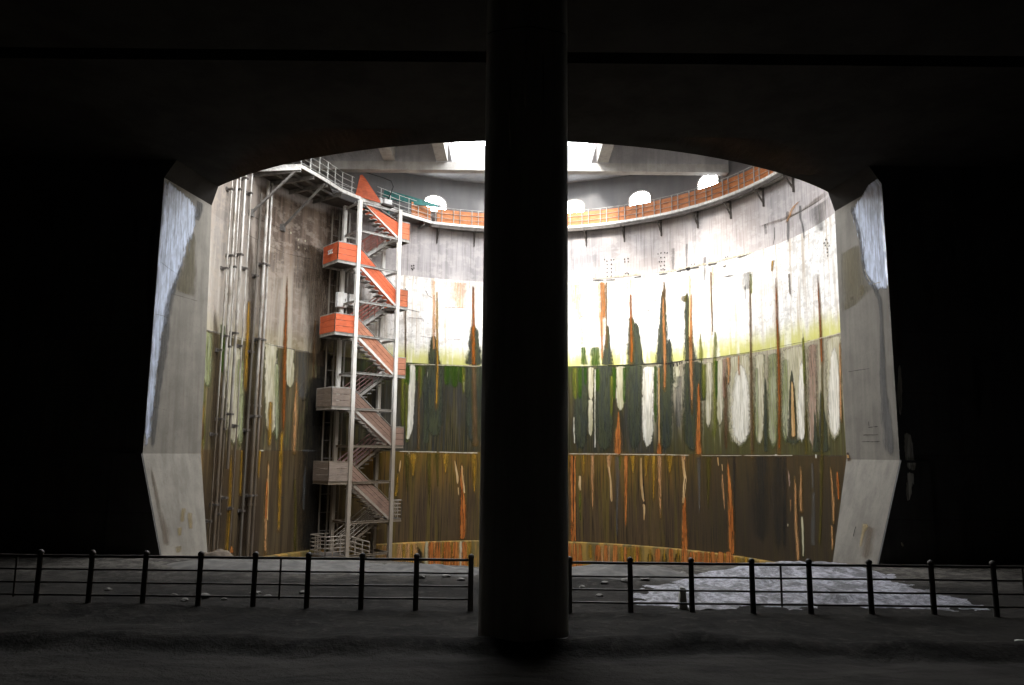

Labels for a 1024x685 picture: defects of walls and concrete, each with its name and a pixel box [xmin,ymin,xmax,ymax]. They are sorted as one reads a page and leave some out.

corrosion [245,289,297,555]
corrosion [378,283,478,566]
leakage [401,327,482,444]
corrosion [568,275,748,567]
leakage [573,291,842,544]
corrosion [775,281,790,454]